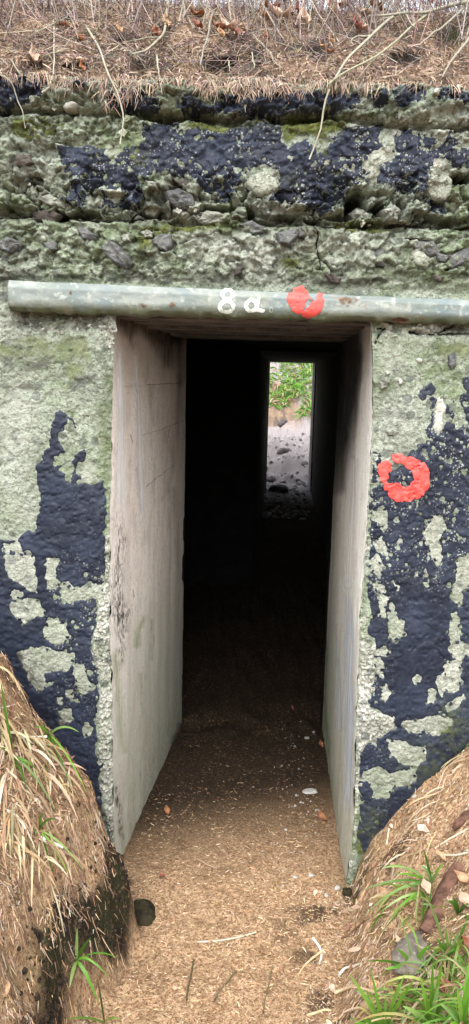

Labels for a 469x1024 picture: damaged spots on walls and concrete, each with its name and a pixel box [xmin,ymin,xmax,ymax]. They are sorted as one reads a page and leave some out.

crack [275,212,469,269]
peeling [434,397,446,435]
spalling [3,524,117,851]
spalling [349,505,469,871]